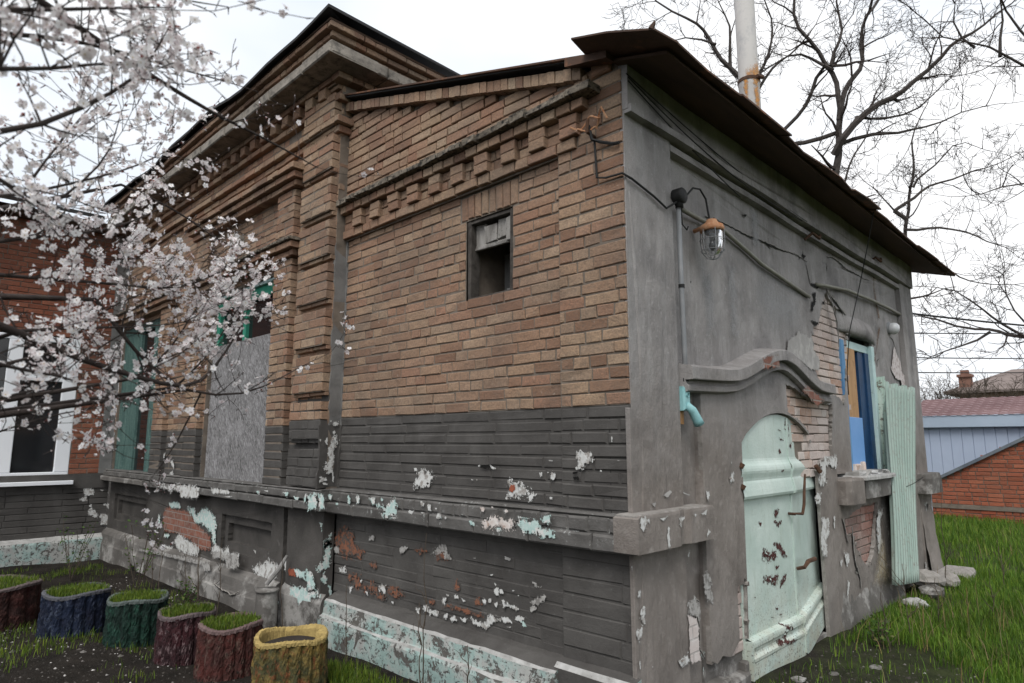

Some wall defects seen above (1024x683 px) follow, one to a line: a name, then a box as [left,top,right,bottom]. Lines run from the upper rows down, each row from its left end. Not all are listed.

corrosion [743,64,760,107]
crack [706,214,869,346]
spalling [891,347,905,385]
spalling [135,452,239,573]
peeling [252,420,451,604]
peeling [469,479,555,539]
peeling [573,449,602,480]
spalling [763,283,884,566]
peeling [415,574,546,629]
spalling [679,571,714,675]